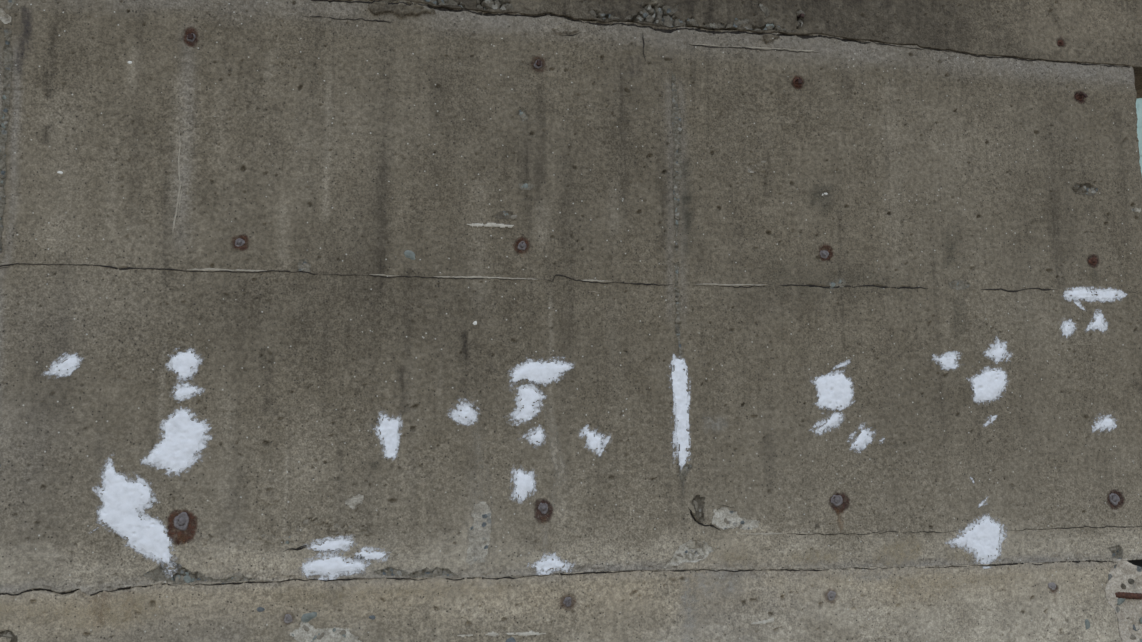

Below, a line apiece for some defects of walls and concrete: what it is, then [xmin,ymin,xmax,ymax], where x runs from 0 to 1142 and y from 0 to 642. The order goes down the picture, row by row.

crack [300,0,1130,68]
rust [535,499,553,521]
rust [829,493,849,513]
rust [1108,490,1124,509]
rust [167,510,197,545]
crack [787,528,956,536]
crack [1013,523,1139,531]
crack [386,560,1116,581]
crack [0,578,357,596]
spalling [1105,544,1142,642]